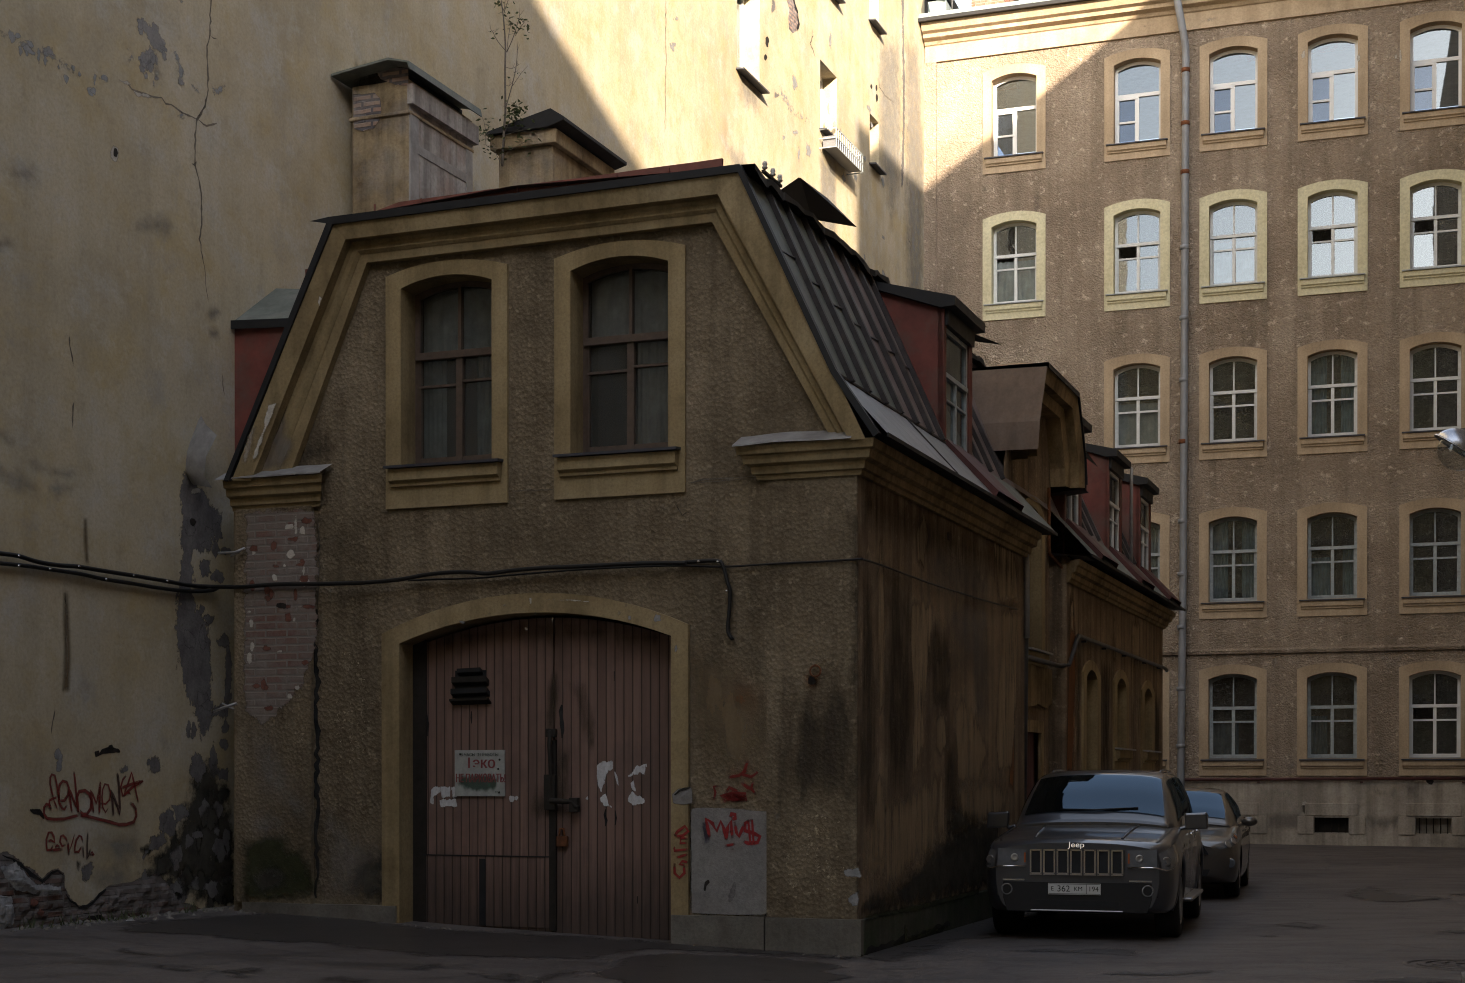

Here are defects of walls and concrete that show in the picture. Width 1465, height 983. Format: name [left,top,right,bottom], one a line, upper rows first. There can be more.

peeling [129,18,198,91]
crack [120,0,217,297]
spalling [0,851,200,929]
peeling [147,755,160,774]
flaking render [174,471,319,740]
leakage [862,542,1017,914]